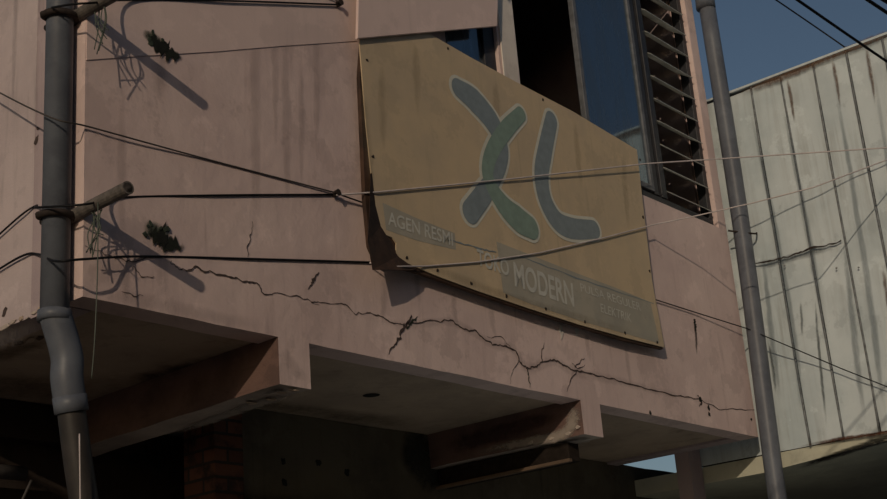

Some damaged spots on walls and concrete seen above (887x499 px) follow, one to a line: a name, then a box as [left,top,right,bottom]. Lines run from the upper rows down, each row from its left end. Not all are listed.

spalling [145,30,181,62]
spalling [142,220,182,253]
crack [86,246,153,297]
crack [170,261,746,411]
damp [810,435,887,464]